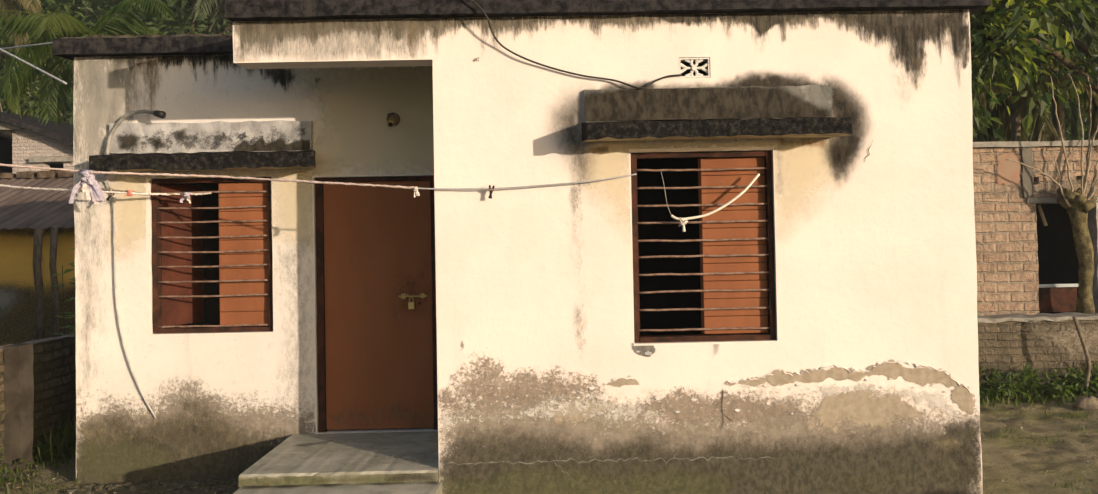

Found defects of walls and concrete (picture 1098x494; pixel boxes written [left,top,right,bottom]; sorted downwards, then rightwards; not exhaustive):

water stain [74,10,970,173]
water stain [76,379,315,484]
spalling [632,343,655,357]
water stain [392,378,982,494]
peeling [635,360,975,435]